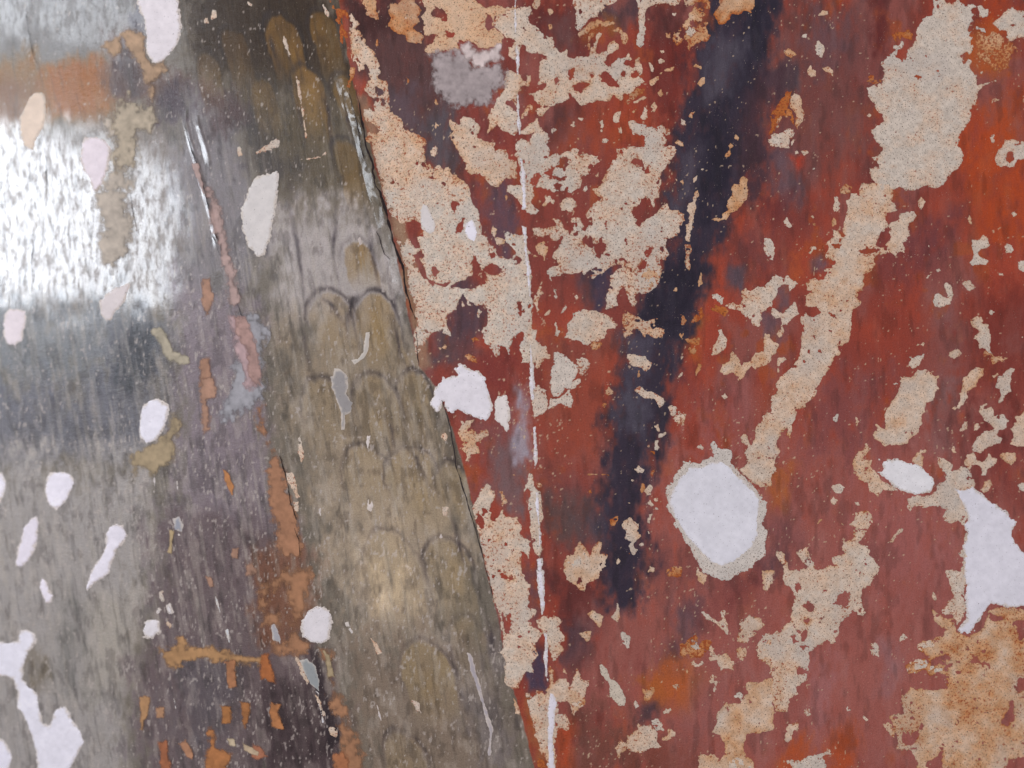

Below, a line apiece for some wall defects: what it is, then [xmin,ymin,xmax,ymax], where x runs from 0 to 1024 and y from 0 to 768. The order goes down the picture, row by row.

water stain [95,30,168,267]
corrosion [140,696,164,730]
corrosion [199,358,216,433]
corrosion [192,163,261,385]
corrosion [158,456,366,768]
peeling [315,695,338,737]
crack [349,93,419,363]
crack [441,400,494,601]
peeling [322,0,755,768]
peeling [680,502,880,768]
peeling [678,0,1024,493]
peeling [883,592,1024,768]